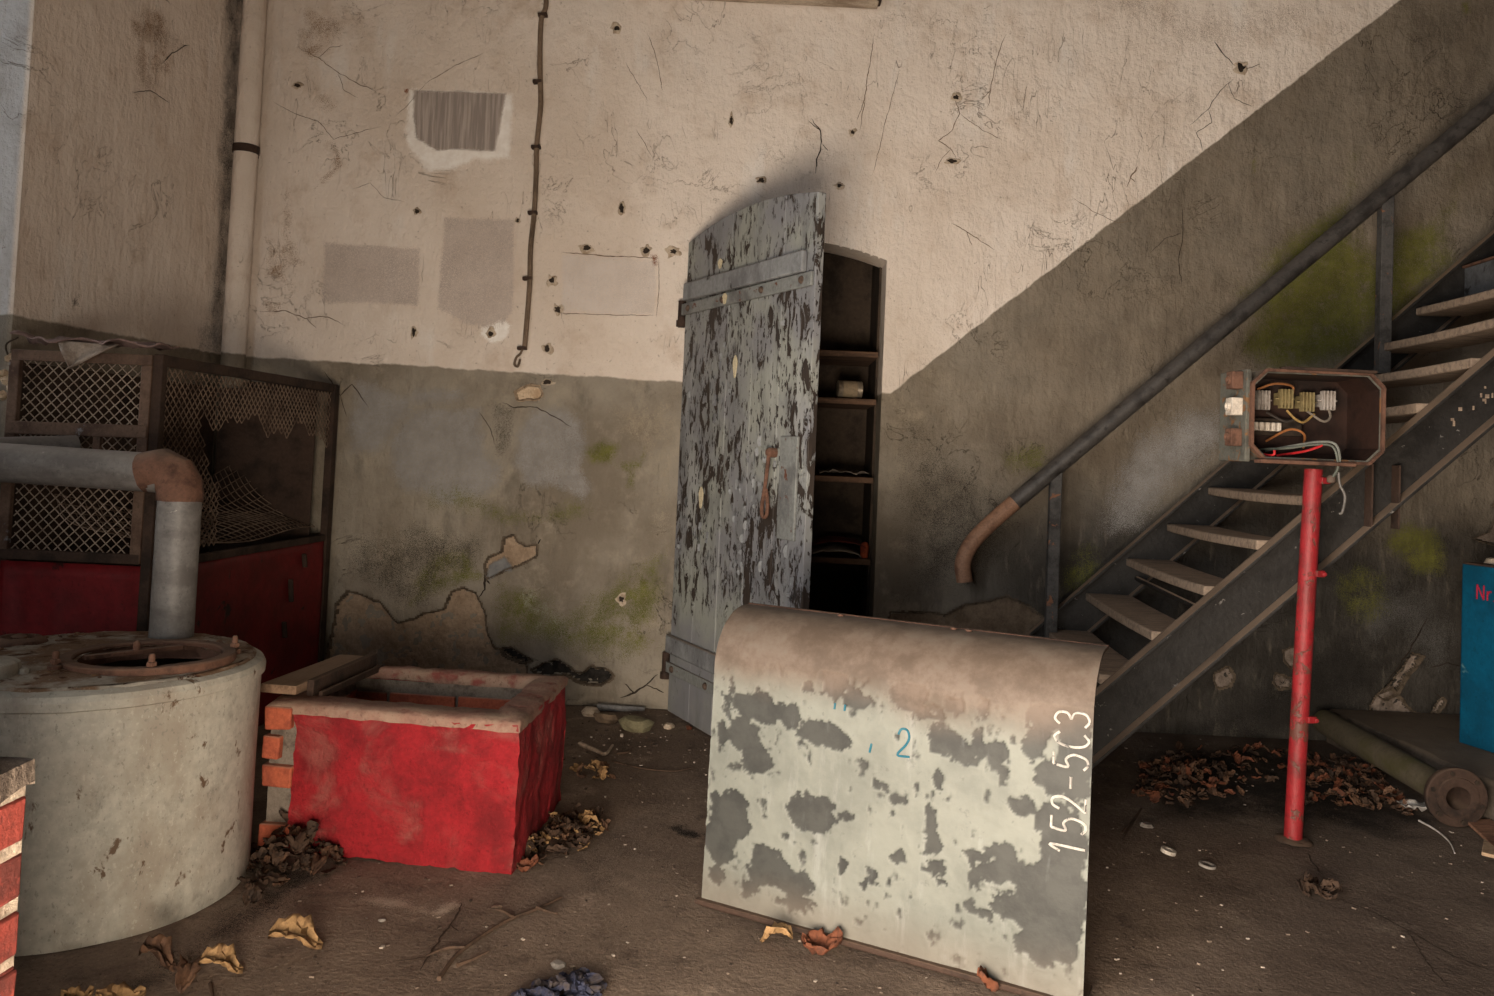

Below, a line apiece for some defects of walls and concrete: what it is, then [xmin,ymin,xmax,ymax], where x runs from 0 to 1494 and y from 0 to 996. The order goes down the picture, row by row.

spalling [483,534,539,581]
spalling [888,594,1044,635]
spalling [258,646,615,875]